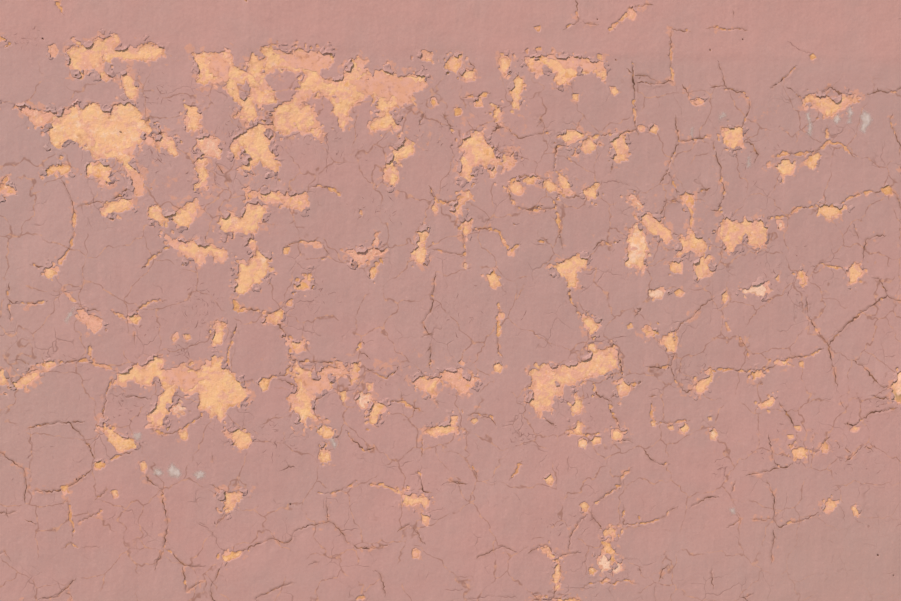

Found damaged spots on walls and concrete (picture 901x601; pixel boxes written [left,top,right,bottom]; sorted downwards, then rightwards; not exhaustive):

peeling [12,29,476,313]
peeling [432,49,619,241]
crack [424,121,628,368]
crack [588,11,748,139]
peeling [620,190,784,282]
crack [0,346,147,548]
peeling [113,318,272,450]
crack [147,477,424,601]
peeling [261,265,391,465]
crack [226,299,439,411]
peeling [524,310,630,449]
crack [447,225,901,600]